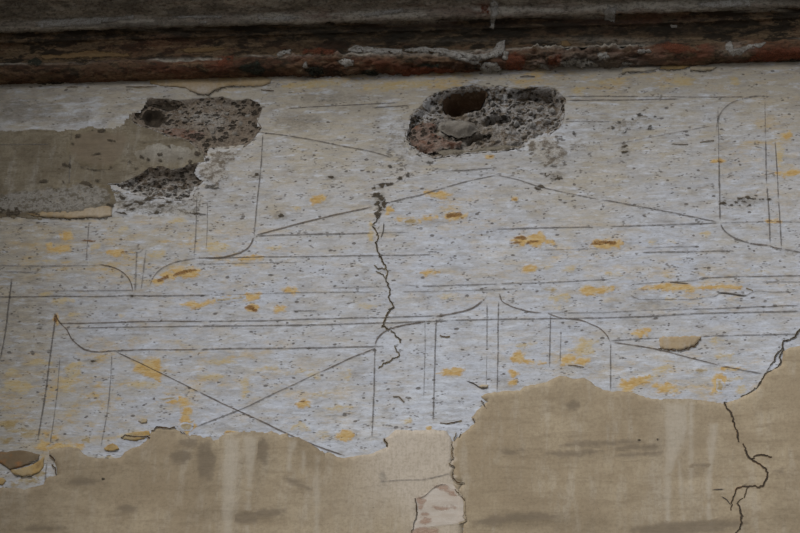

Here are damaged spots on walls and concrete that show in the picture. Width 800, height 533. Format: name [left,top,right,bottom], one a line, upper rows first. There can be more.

spalling [0,50,572,228]
crack [371,219,402,368]
peeling [0,354,219,533]
crack [440,400,486,520]
peeling [292,326,703,533]
peeling [695,346,800,533]
crack [714,329,800,533]